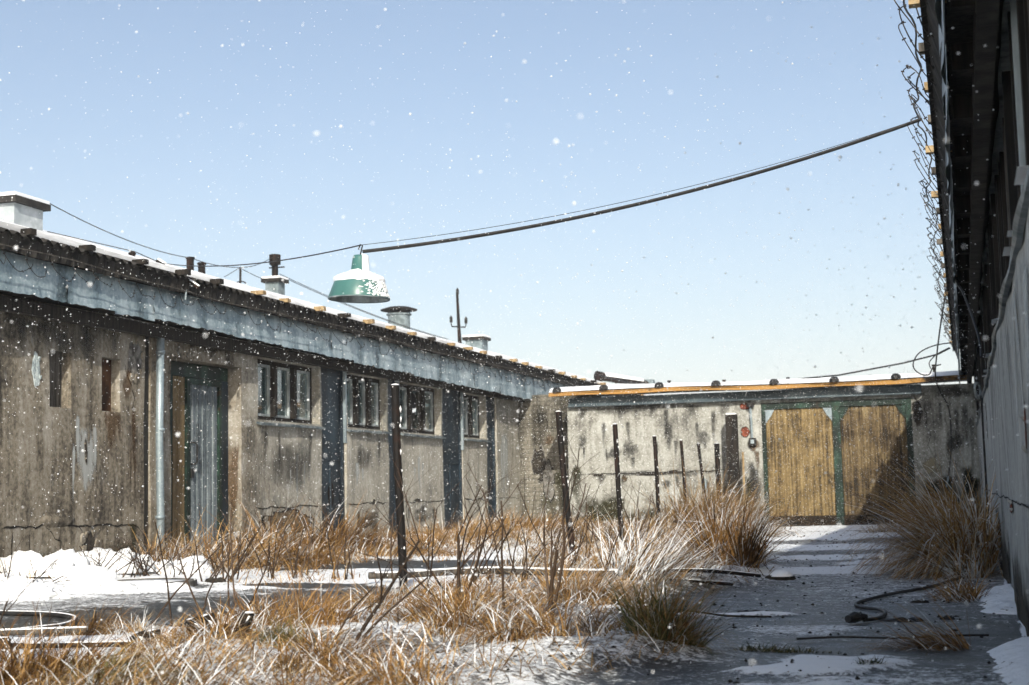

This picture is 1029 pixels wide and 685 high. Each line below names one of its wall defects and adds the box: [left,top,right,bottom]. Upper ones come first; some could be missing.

leakage [602,404,676,445]
leakage [938,386,974,453]
leakage [264,433,305,491]
leakage [606,444,688,488]
leakage [922,457,982,502]
crack [254,504,319,512]
crack [4,523,143,555]